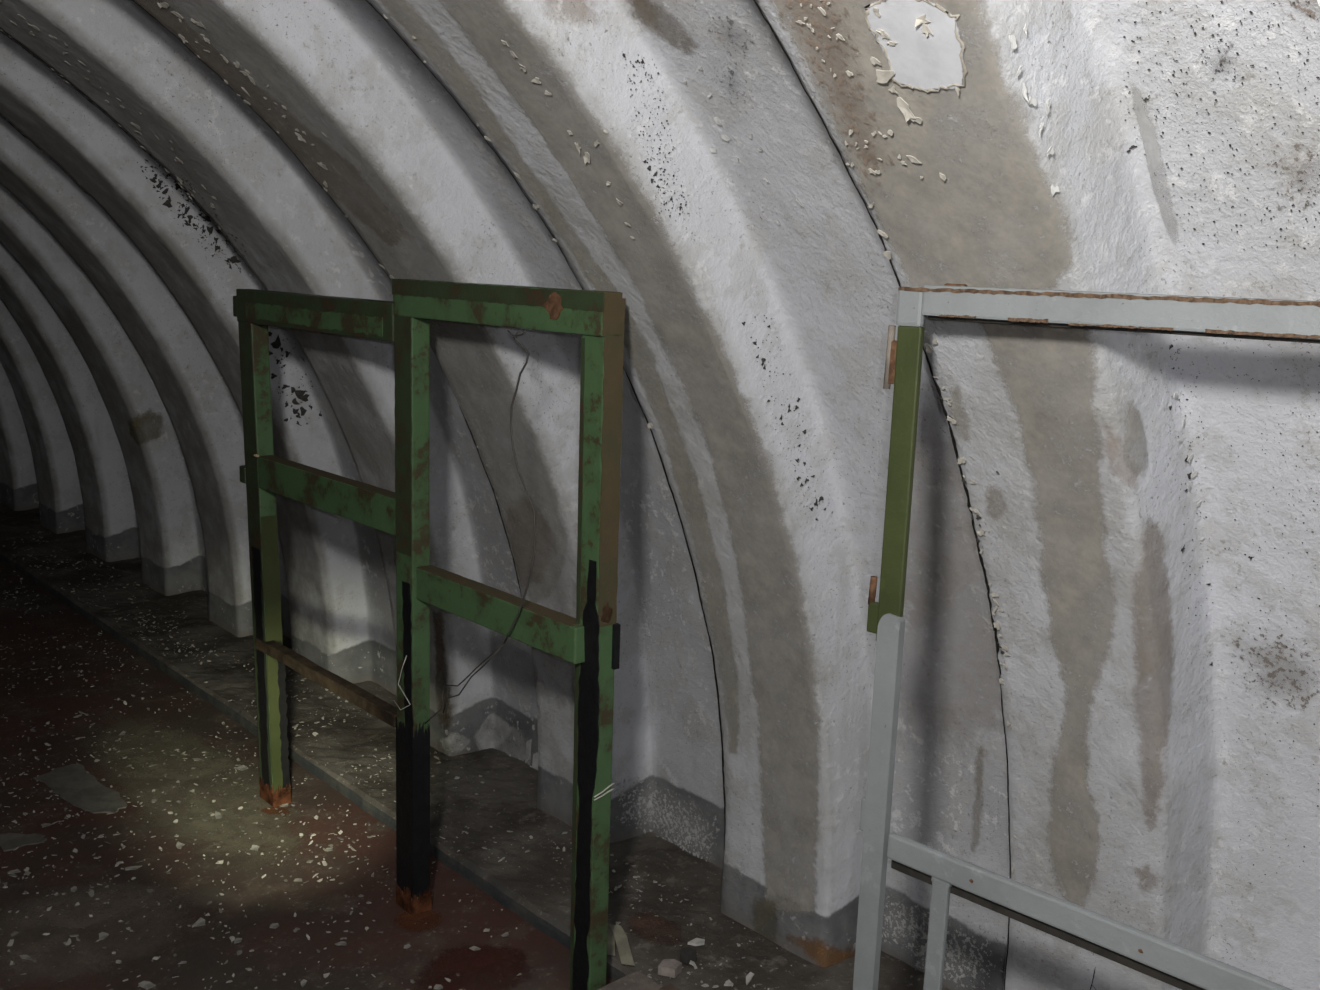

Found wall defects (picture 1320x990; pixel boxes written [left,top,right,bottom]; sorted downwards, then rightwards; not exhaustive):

damp [292,141,422,280]
damp [382,0,617,292]
peeling [849,129,923,179]
damp [771,0,1071,290]
damp [448,0,818,914]
damp [433,613,447,721]
damp [983,322,1113,906]